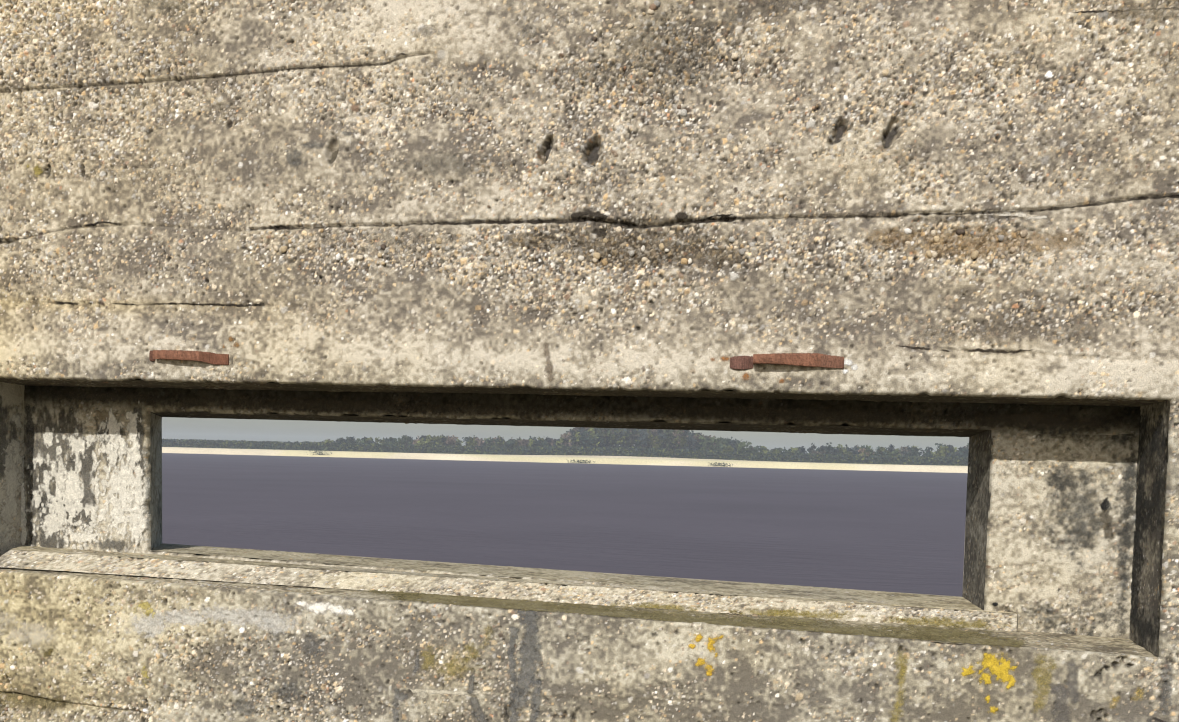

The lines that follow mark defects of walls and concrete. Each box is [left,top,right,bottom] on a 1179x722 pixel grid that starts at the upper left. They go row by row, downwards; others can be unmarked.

crack [74,53,427,87]
crack [66,221,121,229]
crack [254,195,1179,236]
leakage [9,406,95,548]
leakage [93,539,127,551]
leakage [507,610,542,722]